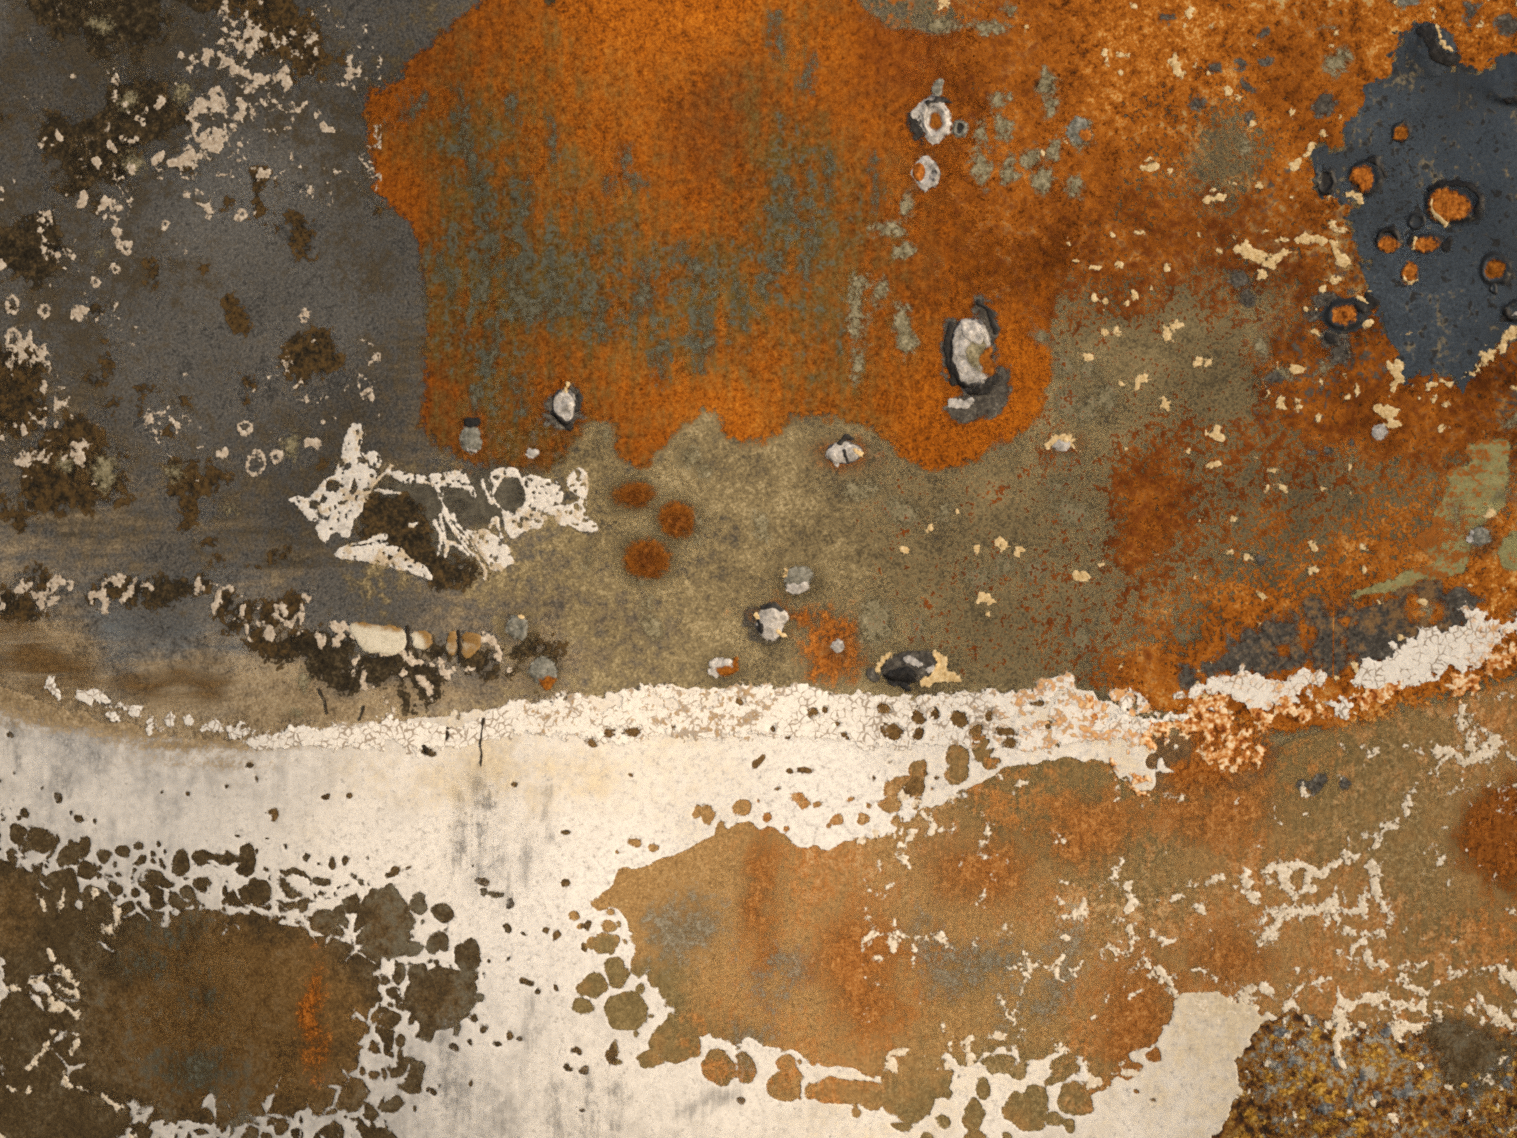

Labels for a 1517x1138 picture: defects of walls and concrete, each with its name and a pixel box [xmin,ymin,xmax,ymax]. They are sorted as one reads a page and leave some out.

water stain [1323,47,1354,79]
peeling [37,0,382,346]
peeling [1216,0,1517,433]
peeling [0,284,89,478]
water stain [1030,330,1117,427]
peeling [237,420,283,477]
peeling [252,339,598,580]
water stain [844,437,919,527]
water stain [1040,448,1096,542]
water stain [858,594,928,651]
peeling [0,438,1517,1138]
rust [1049,794,1141,868]